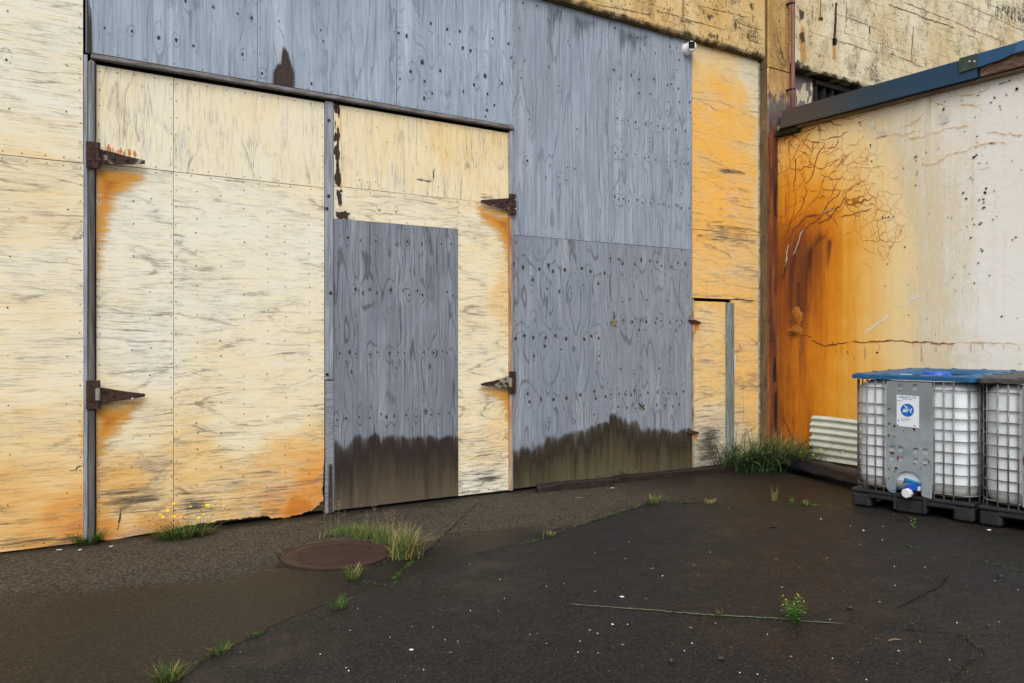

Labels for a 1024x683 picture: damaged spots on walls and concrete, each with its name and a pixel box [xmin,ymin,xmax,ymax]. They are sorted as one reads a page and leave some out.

water stain [273,47,295,87]
rust [97,170,143,268]
peeling [334,103,350,220]
rust [478,205,508,258]
crack [782,81,1017,279]
rust [774,100,956,471]
crack [769,333,1020,362]
rust [97,401,140,465]
water stain [328,433,458,513]
water stain [513,414,692,489]